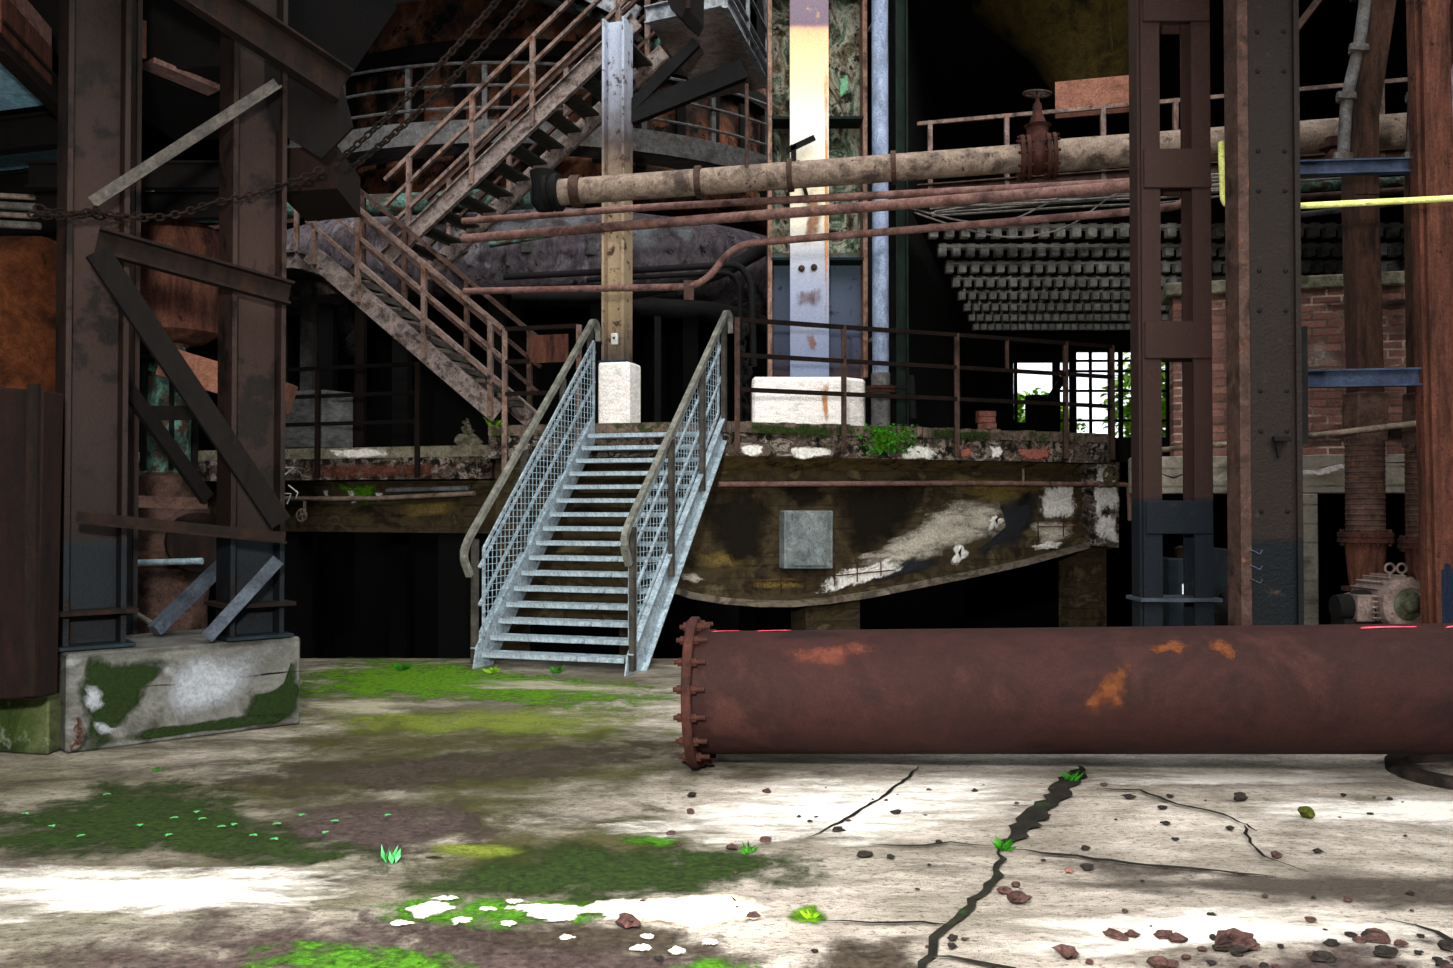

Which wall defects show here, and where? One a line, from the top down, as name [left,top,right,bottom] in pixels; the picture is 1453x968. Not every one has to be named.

rust [806,187,828,274]
spalling [989,515,1004,531]
spalling [834,561,896,586]
spalling [952,545,968,563]
rust [1154,641,1185,653]
rust [1212,640,1235,658]
damp [87,688,113,743]
damp [135,661,285,740]
rust [1086,668,1125,708]
crack [806,766,1308,968]